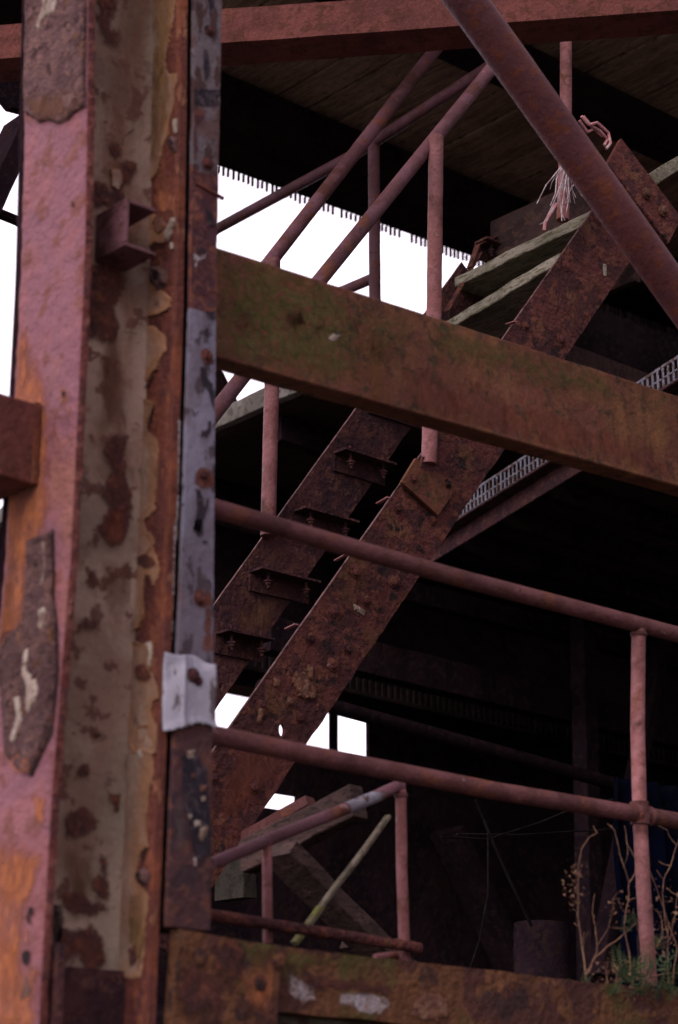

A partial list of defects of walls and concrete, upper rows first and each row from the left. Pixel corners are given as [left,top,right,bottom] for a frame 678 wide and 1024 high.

corrosion [151,0,177,159]
peeling [148,213,176,250]
corrosion [194,171,218,188]
peeling [145,281,172,382]
corrosion [0,337,56,776]
peeling [118,399,160,979]
corrosion [273,664,317,706]
corrosion [65,807,99,837]
corrosion [0,848,39,1024]
corrosion [57,855,110,969]